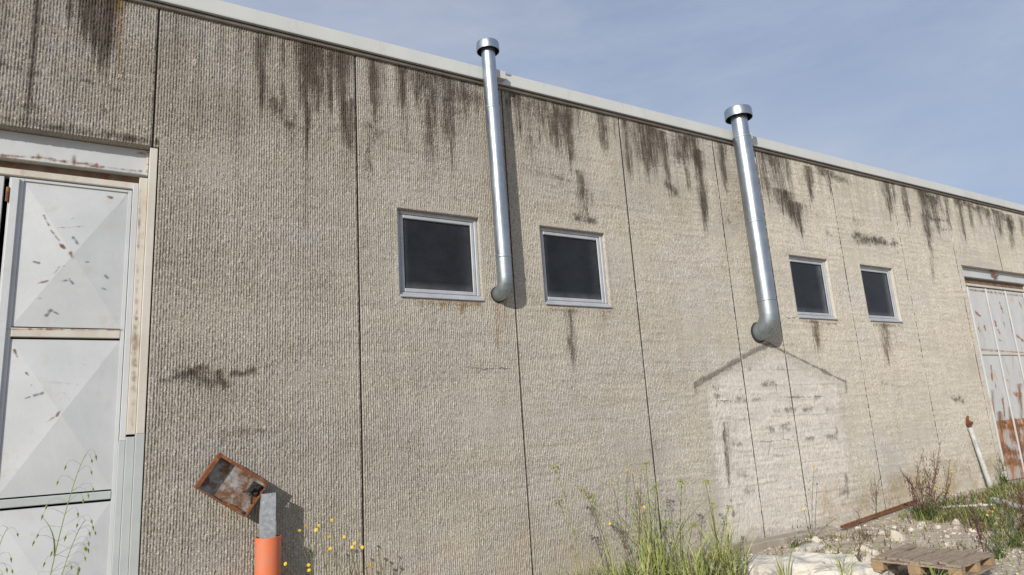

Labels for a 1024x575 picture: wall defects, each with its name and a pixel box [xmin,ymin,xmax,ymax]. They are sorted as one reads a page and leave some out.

water stain [67,0,122,68]
water stain [256,33,284,109]
water stain [299,42,355,147]
water stain [369,59,378,111]
water stain [398,65,477,154]
water stain [538,99,595,223]
water stain [623,120,708,222]
water stain [758,152,840,236]
water stain [885,182,1022,250]
water stain [165,365,255,387]
rust [993,386,1024,474]